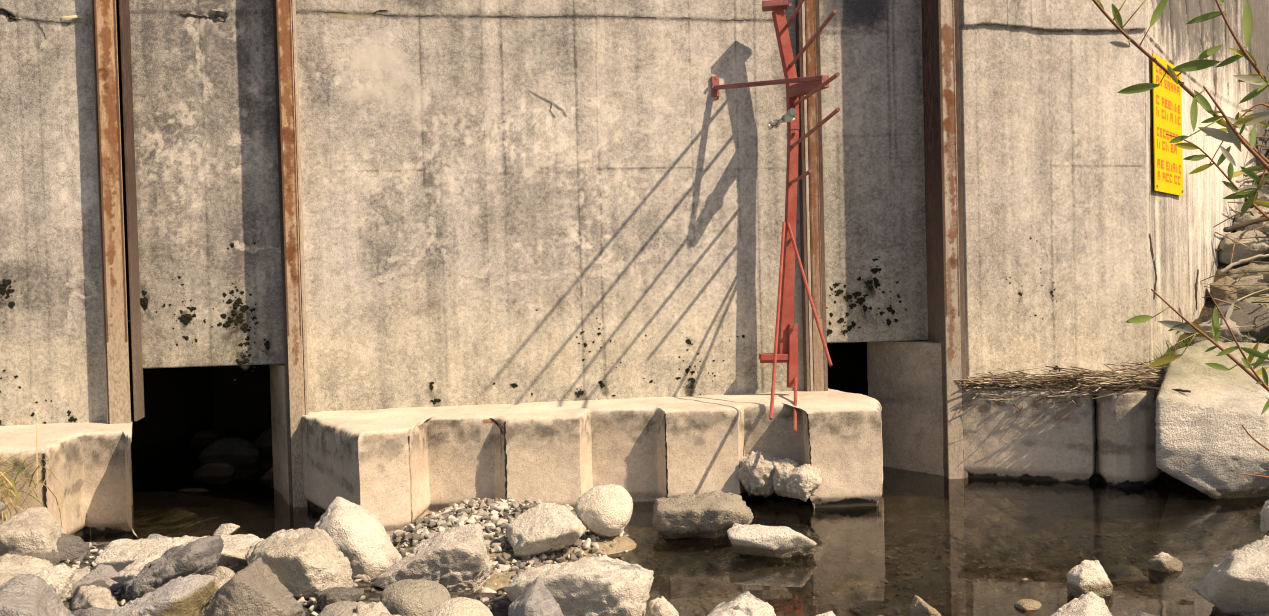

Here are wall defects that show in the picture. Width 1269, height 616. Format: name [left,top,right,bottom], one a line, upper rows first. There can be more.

rust [94,0,127,342]
rust [276,0,301,364]
rust [939,0,960,358]